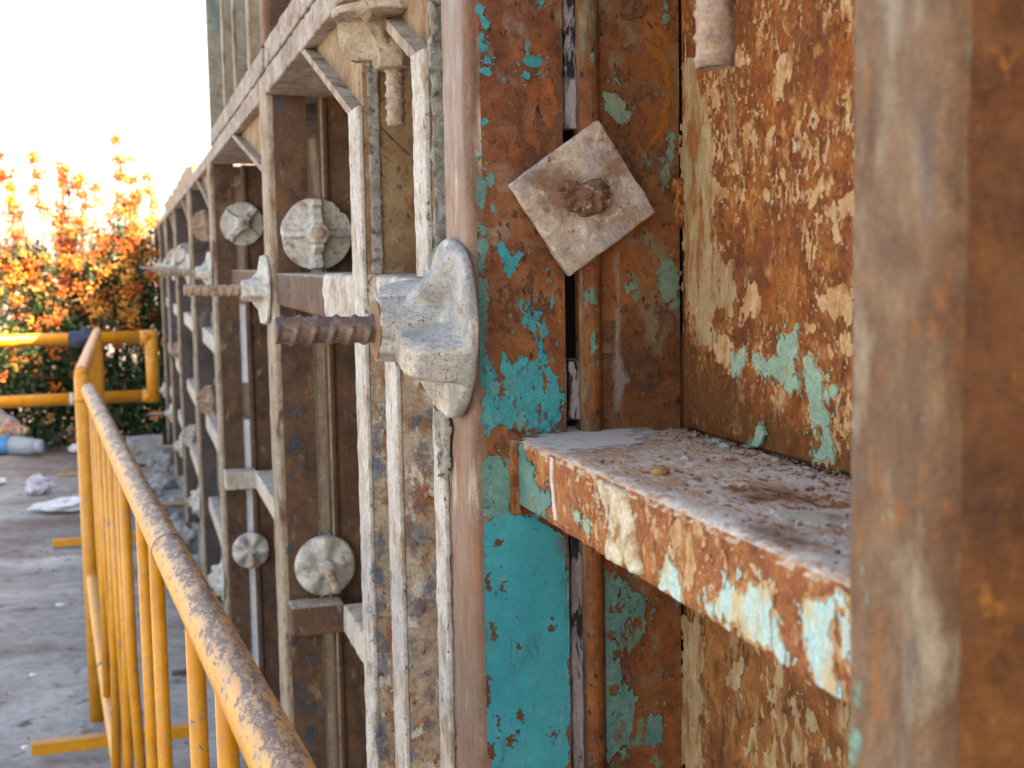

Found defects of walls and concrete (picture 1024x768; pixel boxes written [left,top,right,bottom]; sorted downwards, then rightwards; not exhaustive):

peeling [476,154,499,209]
corrosion [477,196,564,344]
corrosion [508,51,579,209]
corrosion [598,3,675,206]
peeling [651,0,855,473]
corrosion [602,286,677,421]
corrosion [484,566,507,599]
peeling [477,222,571,768]
peeling [571,483,603,550]
peeling [604,511,850,768]
spalling [767,508,851,529]
corrosion [486,675,525,762]